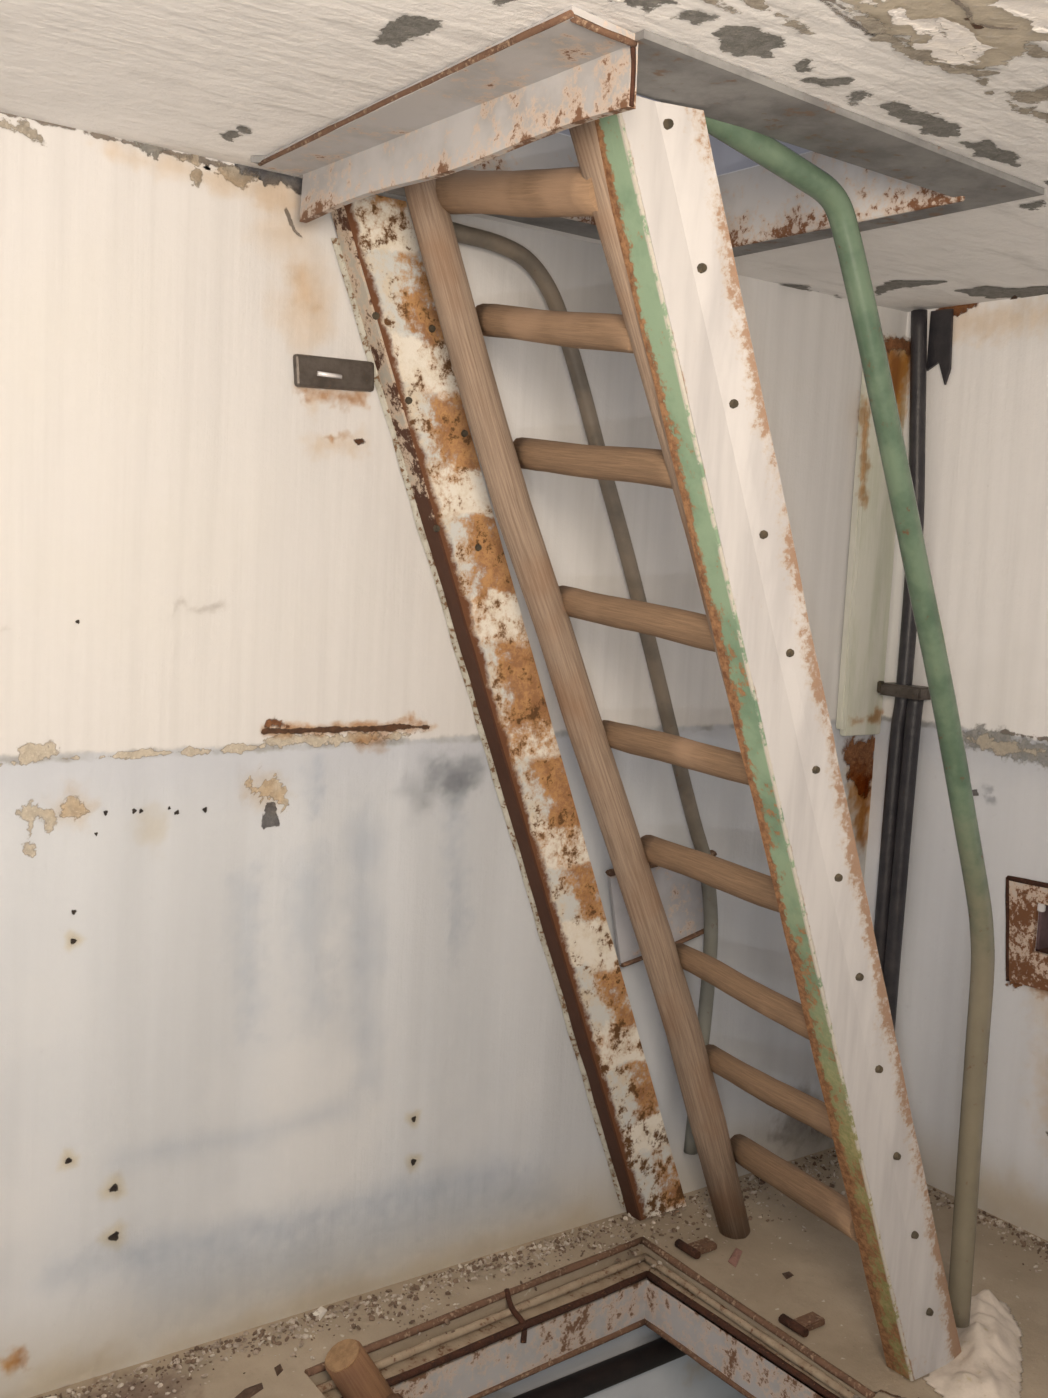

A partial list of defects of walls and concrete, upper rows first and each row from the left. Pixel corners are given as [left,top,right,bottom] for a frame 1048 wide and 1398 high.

rust [258,10,637,166]
peeling [610,0,814,58]
peeling [794,58,1021,167]
peeling [841,0,1048,123]
peeling [875,280,1048,300]
rust [884,336,911,395]
spalling [15,796,108,858]
spalling [244,773,289,829]
rust [842,734,875,814]
spalling [962,724,1048,767]
rust [1005,875,1048,988]
rust [468,1319,756,1398]